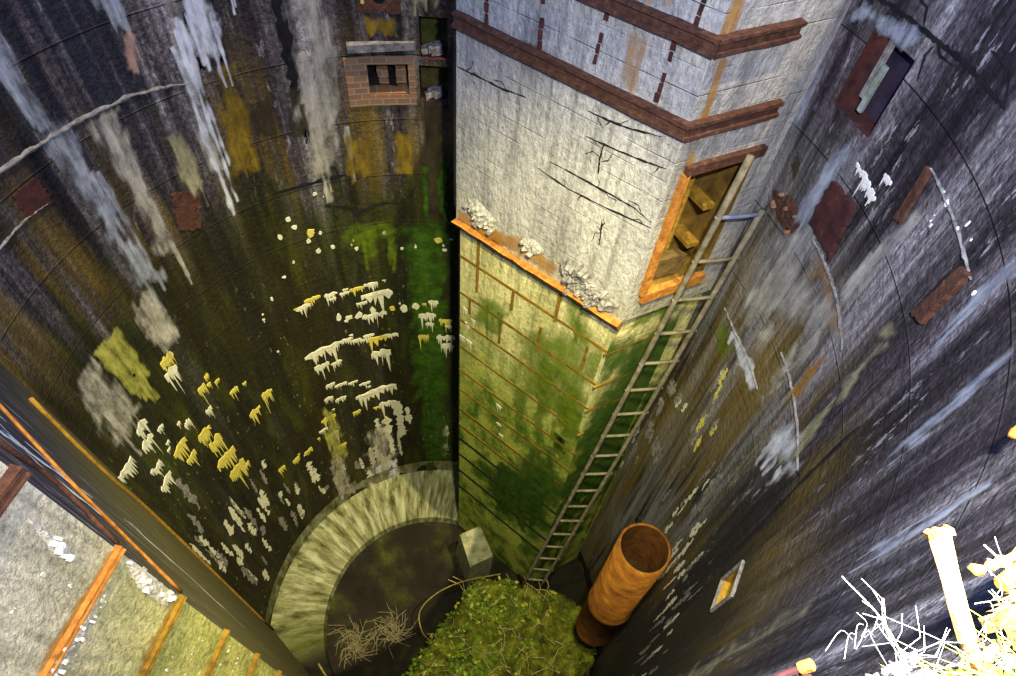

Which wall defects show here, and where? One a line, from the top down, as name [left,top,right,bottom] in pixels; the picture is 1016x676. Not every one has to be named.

corrosion [722,0,744,35]
leakage [169,0,278,215]
leakage [289,0,351,173]
crack [457,62,525,97]
corrosion [700,60,726,120]
crack [537,111,666,245]
leakage [324,409,355,503]
leakage [367,427,399,485]